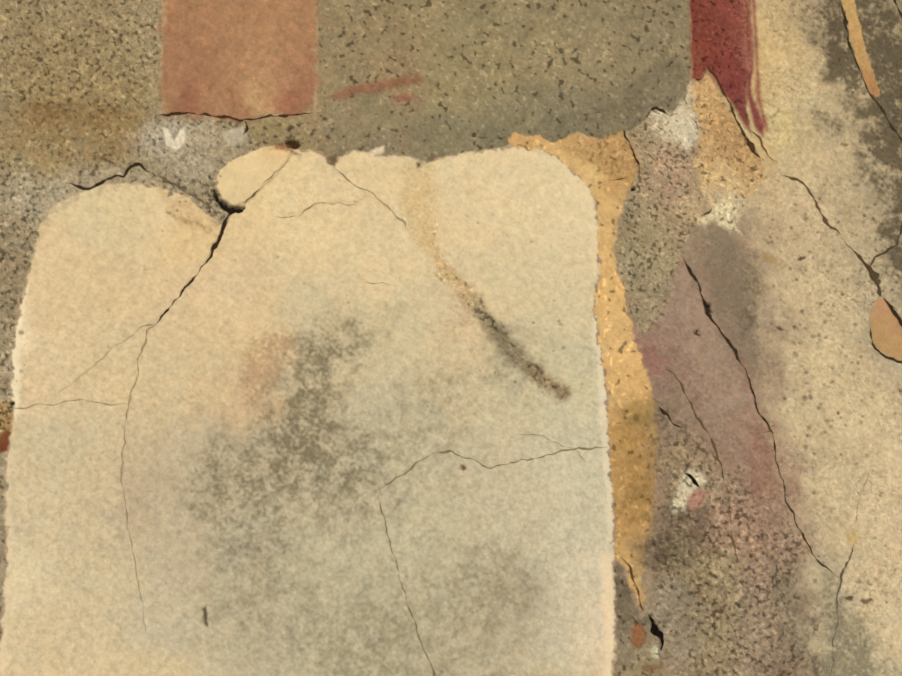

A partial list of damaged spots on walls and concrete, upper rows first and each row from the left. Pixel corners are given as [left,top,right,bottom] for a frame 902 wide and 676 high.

spalling [0,0,371,407]
crack [275,167,406,230]
crack [616,131,639,180]
crack [695,65,902,326]
crack [842,7,902,139]
crack [11,159,289,630]
crack [377,434,607,676]
crack [659,369,741,565]
crack [683,258,853,676]
spalling [869,298,902,361]
crack [870,328,902,363]